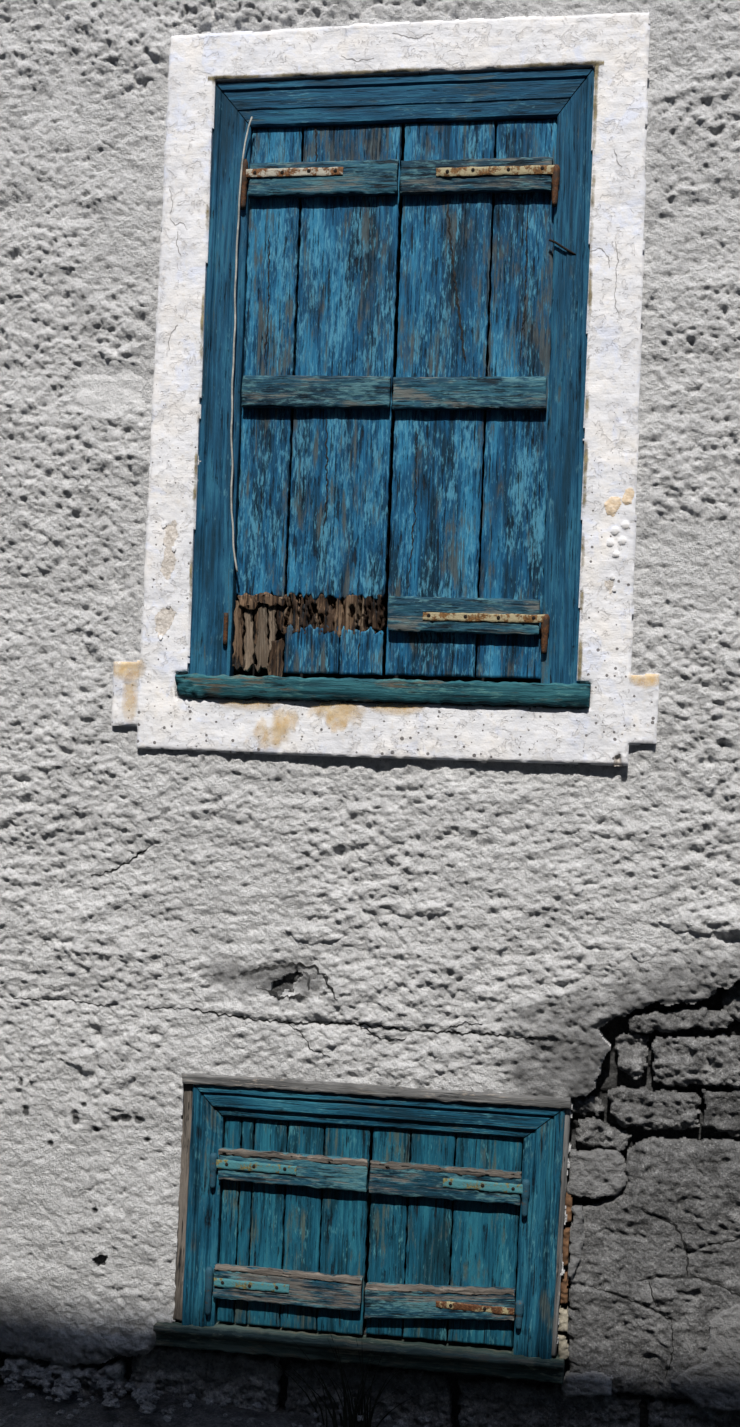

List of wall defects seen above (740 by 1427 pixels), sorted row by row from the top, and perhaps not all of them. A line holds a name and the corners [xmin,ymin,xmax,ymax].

spalling [218,962,338,1001]
spalling [548,980,740,1412]